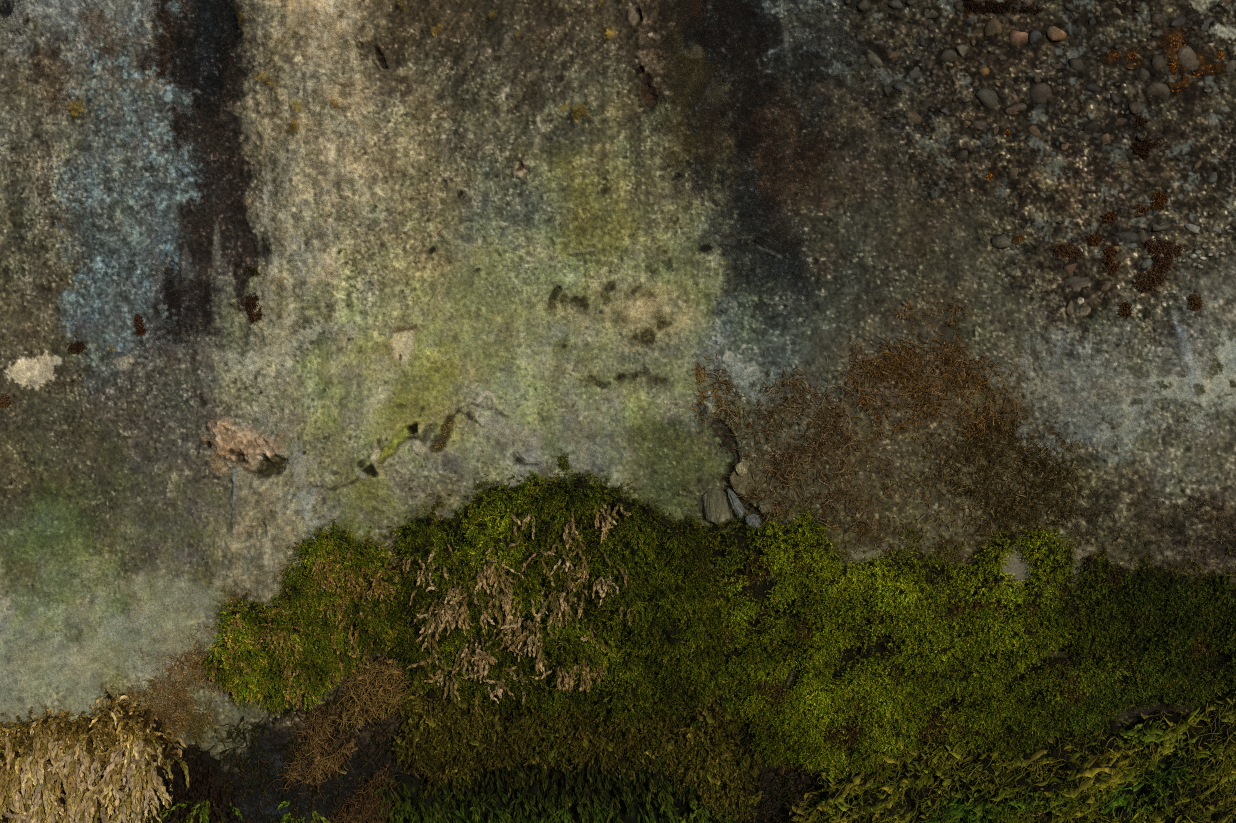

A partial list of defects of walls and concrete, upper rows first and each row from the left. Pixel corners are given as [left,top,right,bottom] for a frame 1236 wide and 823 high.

leakage [0,0,374,542]
spalling [201,418,293,606]